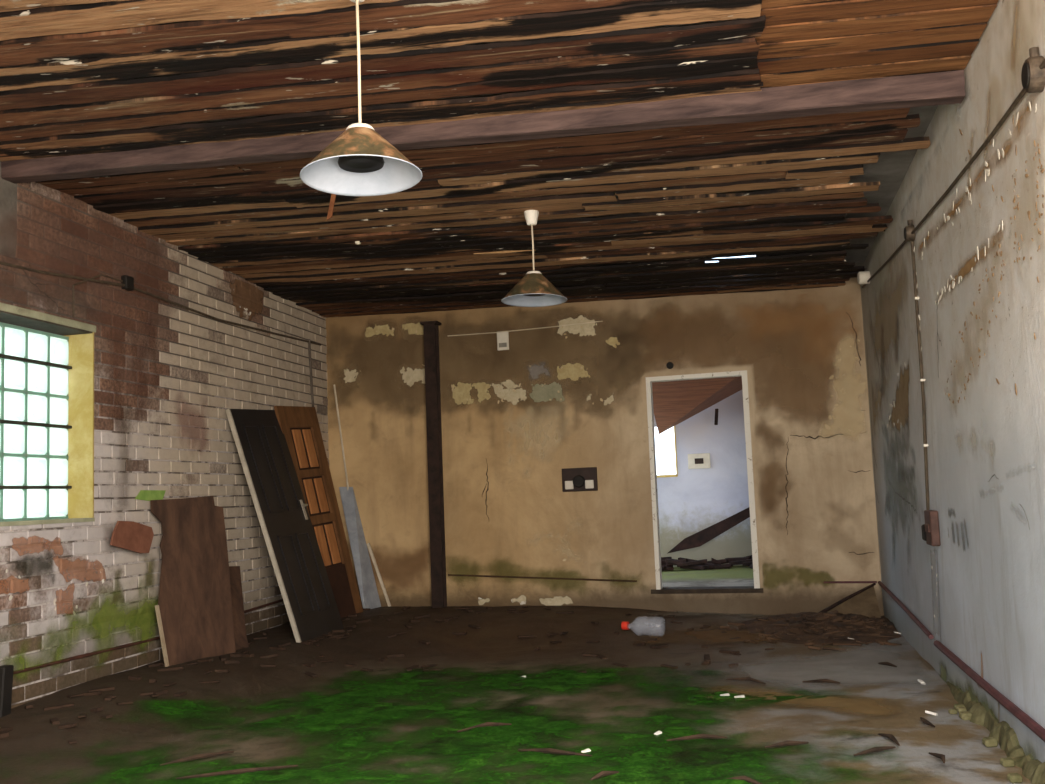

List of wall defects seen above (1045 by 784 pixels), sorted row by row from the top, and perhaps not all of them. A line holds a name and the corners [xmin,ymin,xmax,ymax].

peeling [913,101,1044,343]
peeling [365,323,424,337]
peeling [557,315,620,348]
peeling [344,369,361,383]
peeling [400,364,425,387]
peeling [451,363,590,405]
flaking render [887,362,909,433]
crack [785,312,916,562]
peeling [0,569,30,601]
peeling [12,536,106,616]